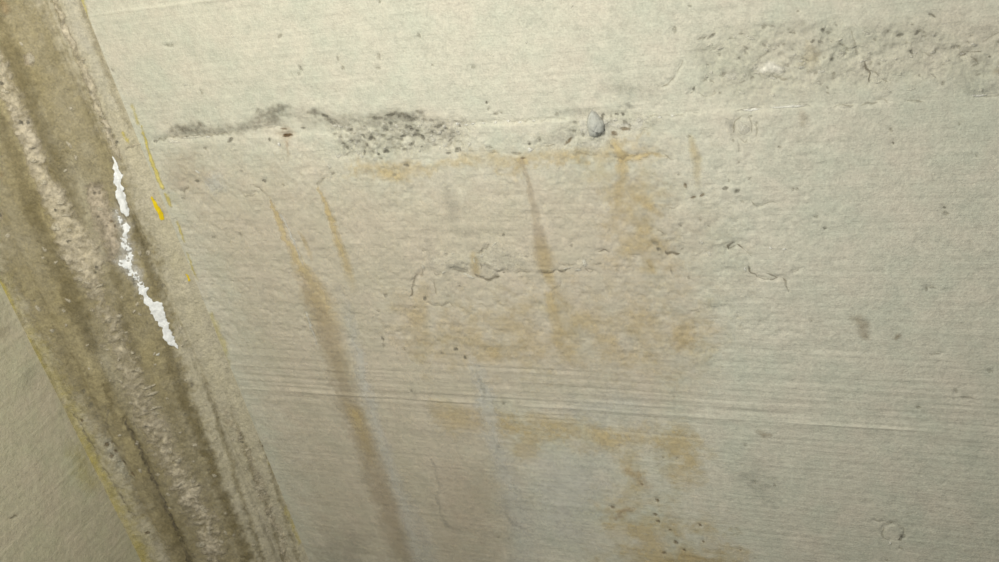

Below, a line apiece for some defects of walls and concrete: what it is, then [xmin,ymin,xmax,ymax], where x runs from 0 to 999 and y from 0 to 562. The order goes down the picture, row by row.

spalling [0,55,235,562]
leakage [0,0,251,562]